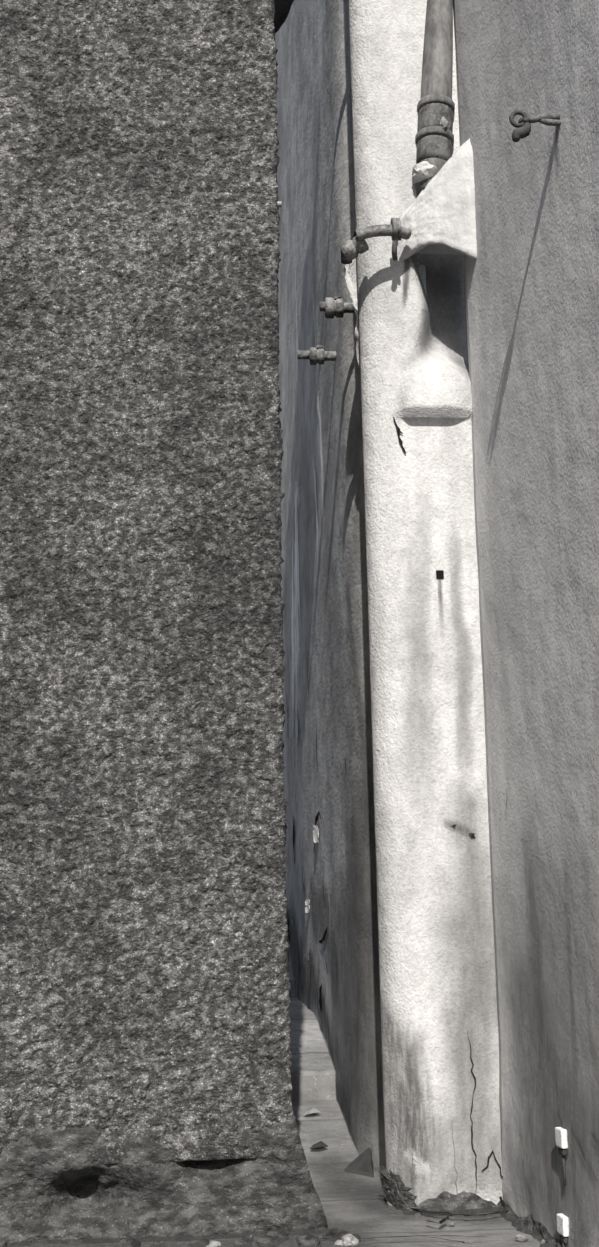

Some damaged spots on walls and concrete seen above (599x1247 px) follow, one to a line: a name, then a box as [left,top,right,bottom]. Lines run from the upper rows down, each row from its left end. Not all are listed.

crack [359,1030,509,1244]